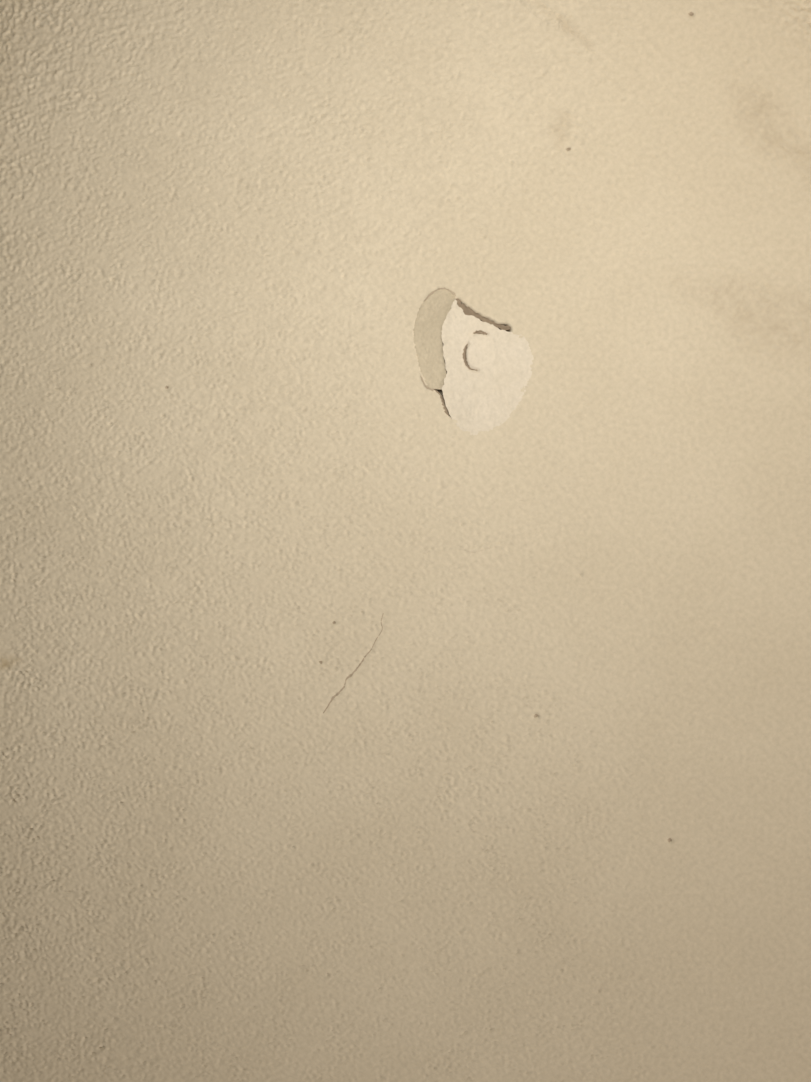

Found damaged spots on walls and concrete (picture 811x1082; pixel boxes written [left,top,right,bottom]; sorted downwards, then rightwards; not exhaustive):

spalling [413,287,534,435]